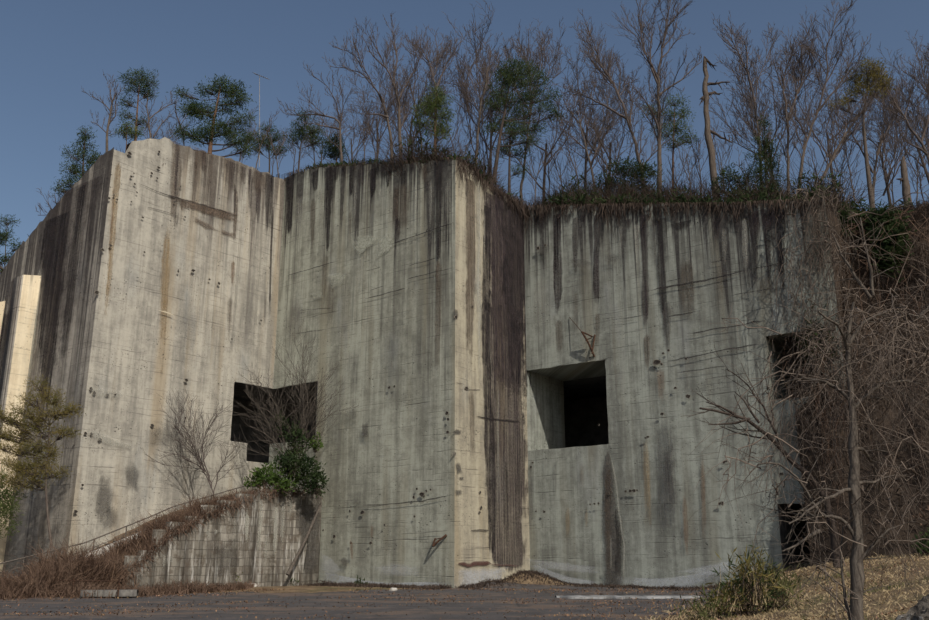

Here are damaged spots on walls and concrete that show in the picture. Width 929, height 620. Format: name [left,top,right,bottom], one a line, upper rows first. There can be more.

damp [0,281,12,378]
damp [27,184,87,391]
damp [313,154,406,248]
damp [423,160,442,340]
damp [466,170,527,570]
damp [536,213,600,309]
damp [627,215,669,338]
damp [733,205,798,298]